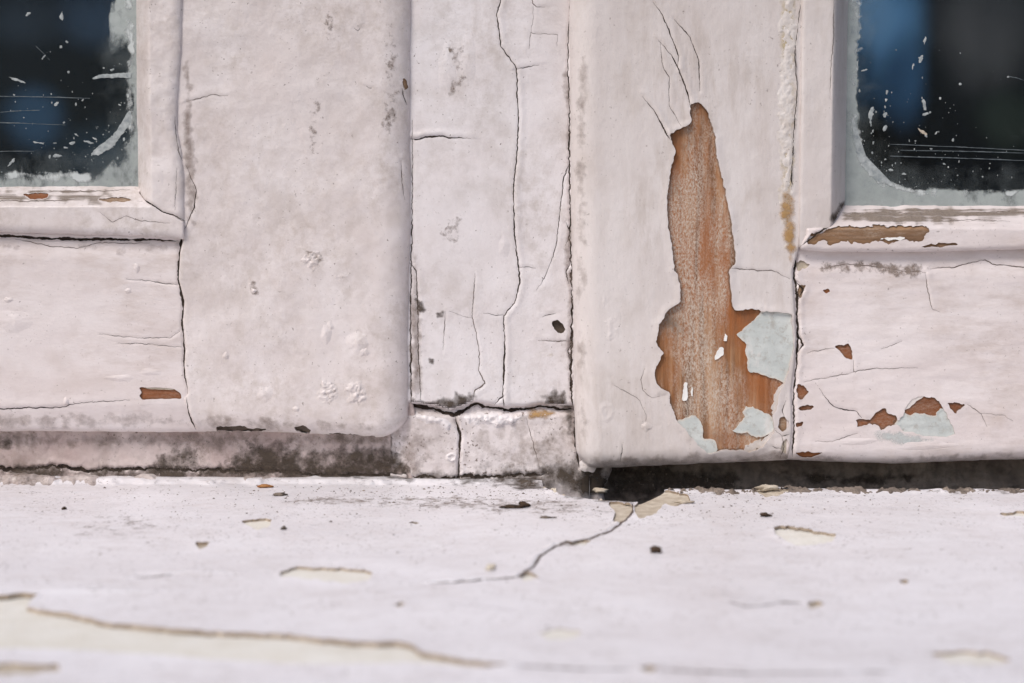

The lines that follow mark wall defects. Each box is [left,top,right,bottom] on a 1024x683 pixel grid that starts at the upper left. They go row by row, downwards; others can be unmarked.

crack [642,2,700,139]
crack [401,0,579,479]
peeling [807,224,957,248]
crack [0,125,197,427]
peeling [655,103,822,457]
peeling [140,387,181,400]
peeling [856,396,964,437]
water stain [9,464,65,476]
water stain [91,437,410,479]
water stain [495,466,739,513]
water stain [807,474,912,485]
crack [437,504,634,583]